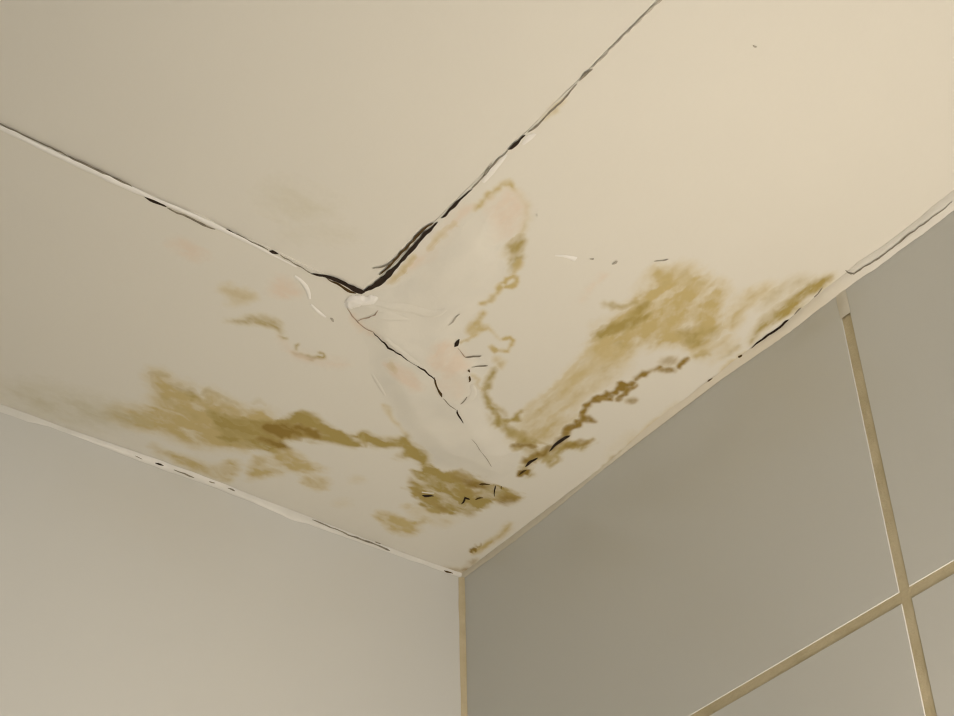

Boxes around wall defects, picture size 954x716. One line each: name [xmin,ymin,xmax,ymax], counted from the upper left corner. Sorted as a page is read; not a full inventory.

crack [0,0,662,504]
water stain [0,170,842,573]
water stain [538,93,571,123]
crack [738,288,822,358]